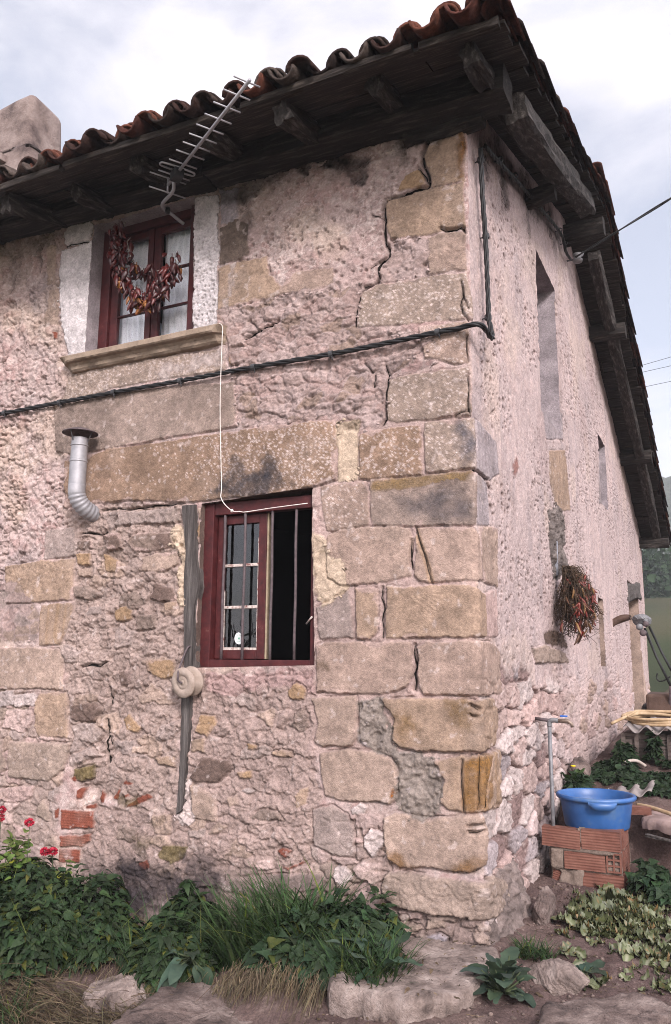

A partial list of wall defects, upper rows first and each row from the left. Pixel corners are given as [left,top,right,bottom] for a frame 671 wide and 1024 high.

crack [356,158,432,327]
water stain [216,463,275,495]
crack [411,527,432,582]
crack [412,646,420,690]
crack [106,693,114,763]